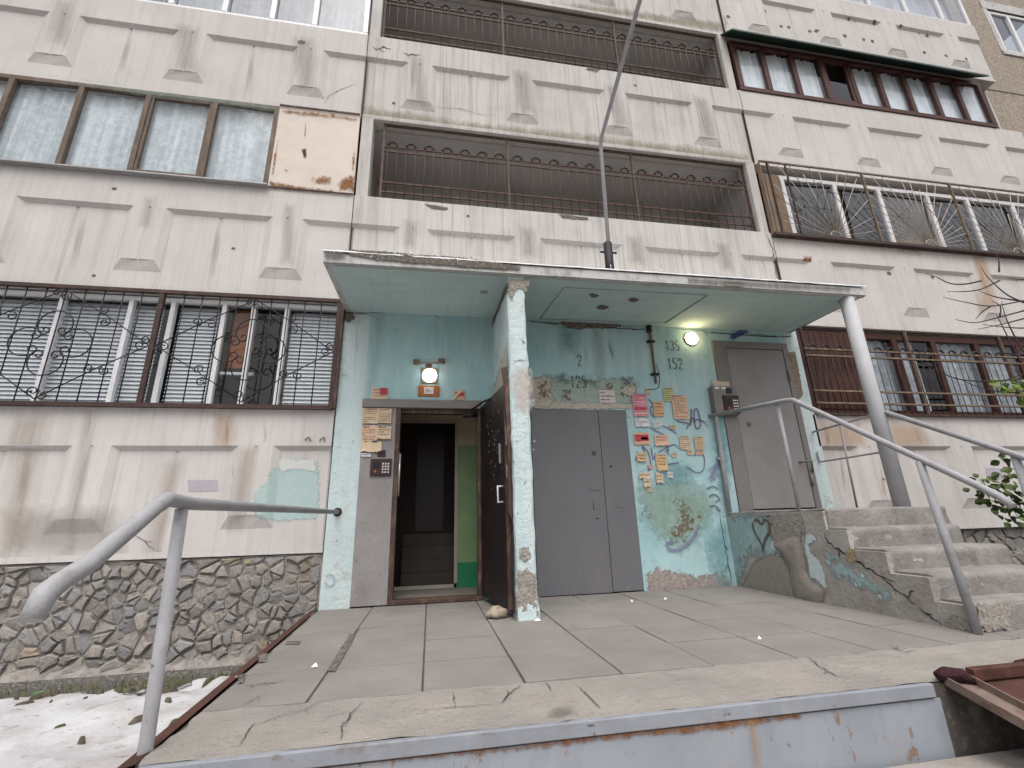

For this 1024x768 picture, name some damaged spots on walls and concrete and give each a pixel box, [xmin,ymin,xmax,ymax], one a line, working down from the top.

rust [270,153,355,193]
spalling [345,249,530,328]
peeling [493,350,639,419]
peeling [254,458,320,522]
spalling [515,547,540,620]
peeling [645,511,891,600]
crack [825,537,941,624]
crack [241,681,364,743]
rust [525,713,799,748]